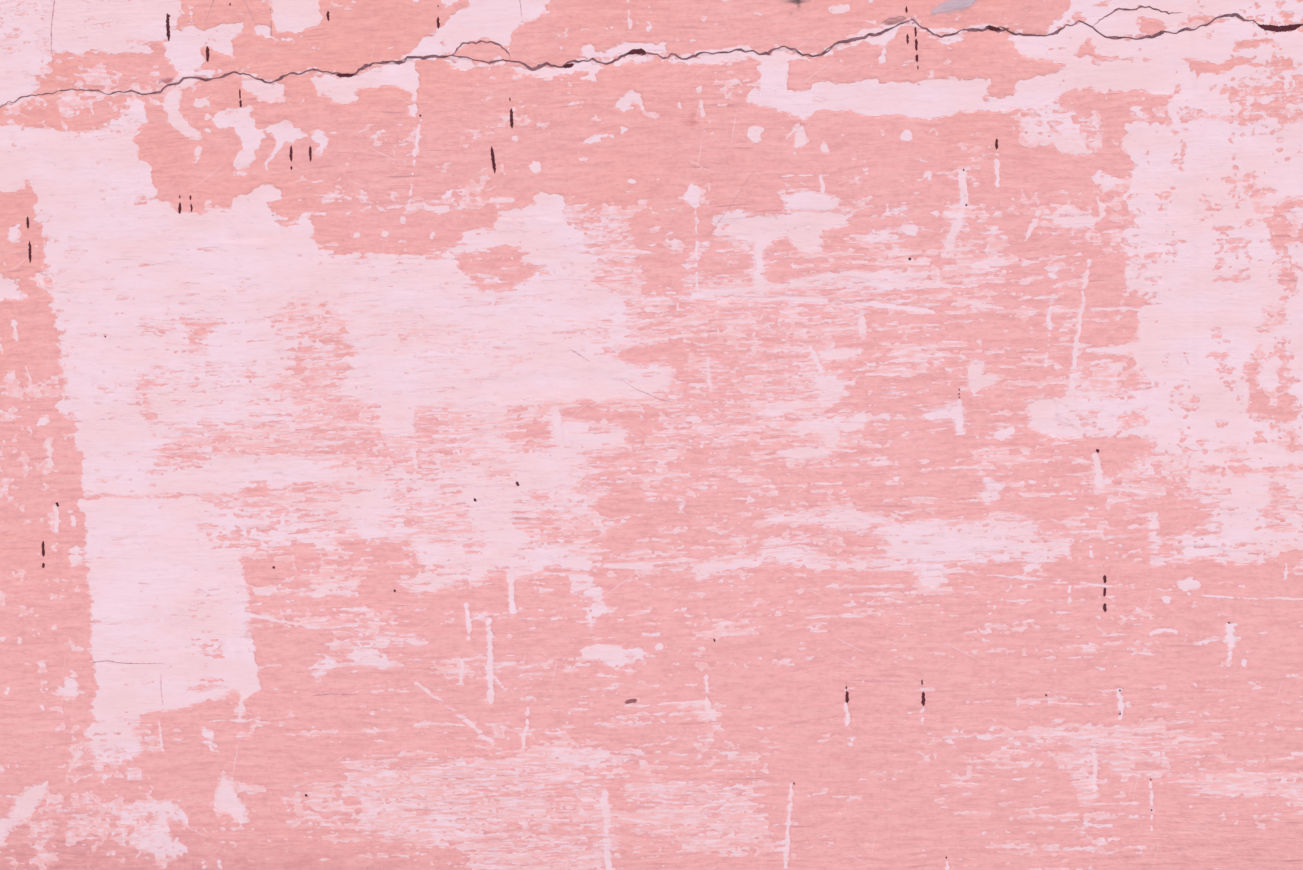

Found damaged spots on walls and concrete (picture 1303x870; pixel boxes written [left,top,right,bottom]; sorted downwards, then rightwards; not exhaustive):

peeling [254,0,356,58]
peeling [828,4,850,14]
crack [0,0,1303,107]
peeling [615,89,660,119]
peeling [435,98,550,176]
peeling [578,114,628,162]
peeling [747,126,764,143]
peeling [900,130,913,141]
peeling [678,183,711,234]
peeling [0,319,18,354]
peeling [38,502,61,568]